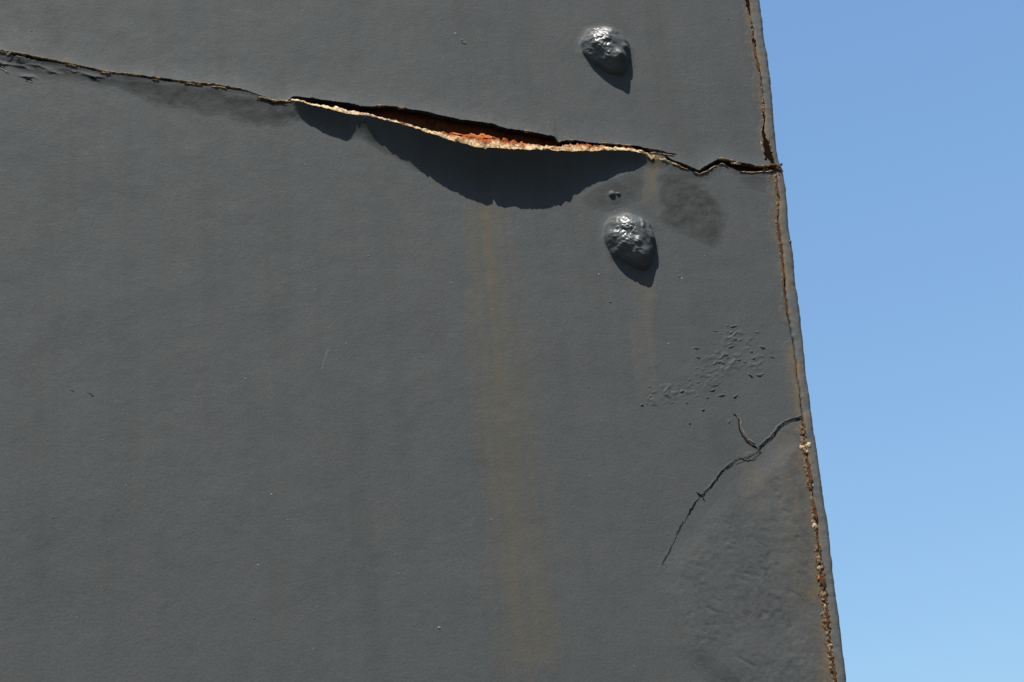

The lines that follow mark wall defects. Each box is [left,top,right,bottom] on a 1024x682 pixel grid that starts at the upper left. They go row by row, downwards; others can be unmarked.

crack [0,50,292,103]
corrosion [301,100,577,146]
damp [580,166,729,248]
crack [662,413,803,565]
corrosion [777,420,837,682]